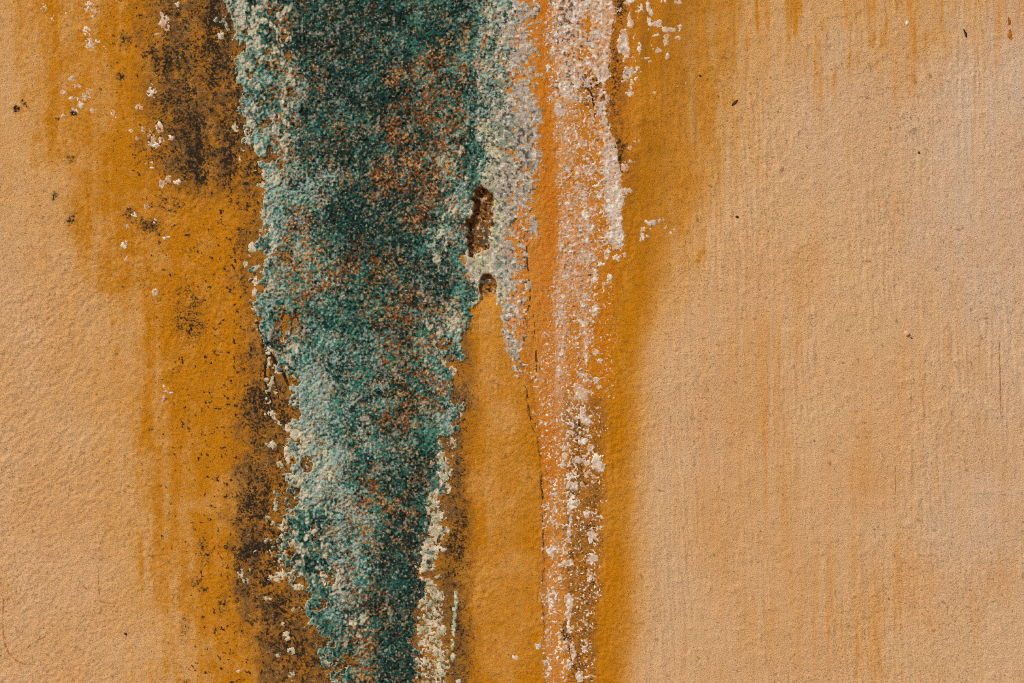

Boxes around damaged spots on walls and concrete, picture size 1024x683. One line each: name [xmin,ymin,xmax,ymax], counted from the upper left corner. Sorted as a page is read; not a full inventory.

water stain [0,0,362,683]
rust [489,0,551,358]
peeling [464,0,691,683]
rust [592,0,649,404]
water stain [407,0,1024,683]